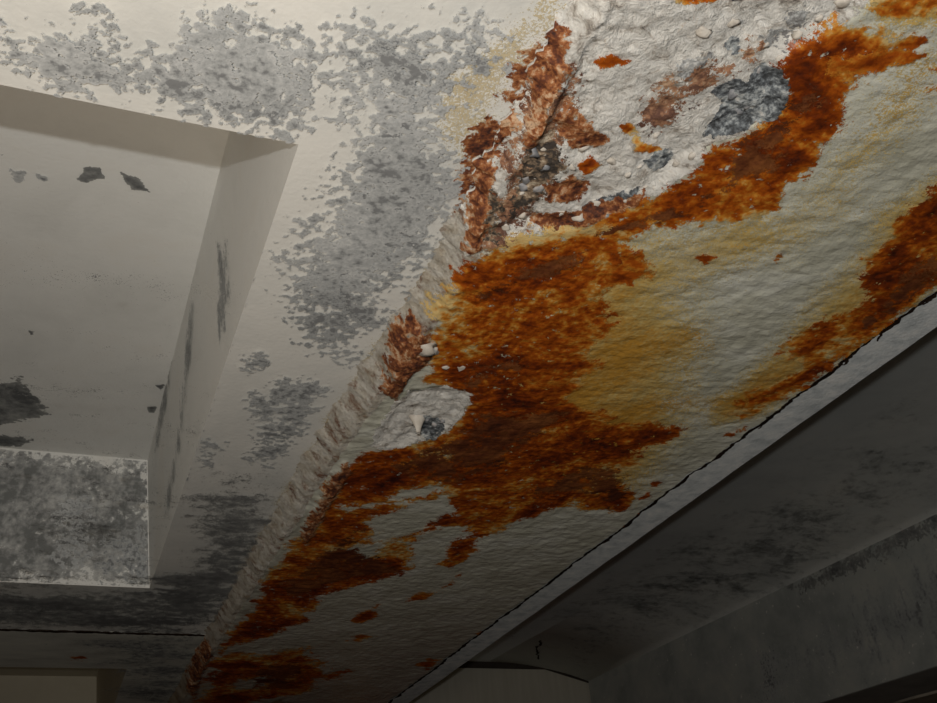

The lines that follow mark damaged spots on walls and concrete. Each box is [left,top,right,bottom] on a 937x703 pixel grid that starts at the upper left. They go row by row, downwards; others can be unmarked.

water stain [431,0,566,176]
spalling [0,0,870,369]
water stain [0,285,295,703]
water stain [211,240,235,345]
peeling [239,351,269,376]
peeling [241,375,334,474]
spalling [370,385,473,450]
corrosion [214,0,937,660]
crack [389,291,937,703]